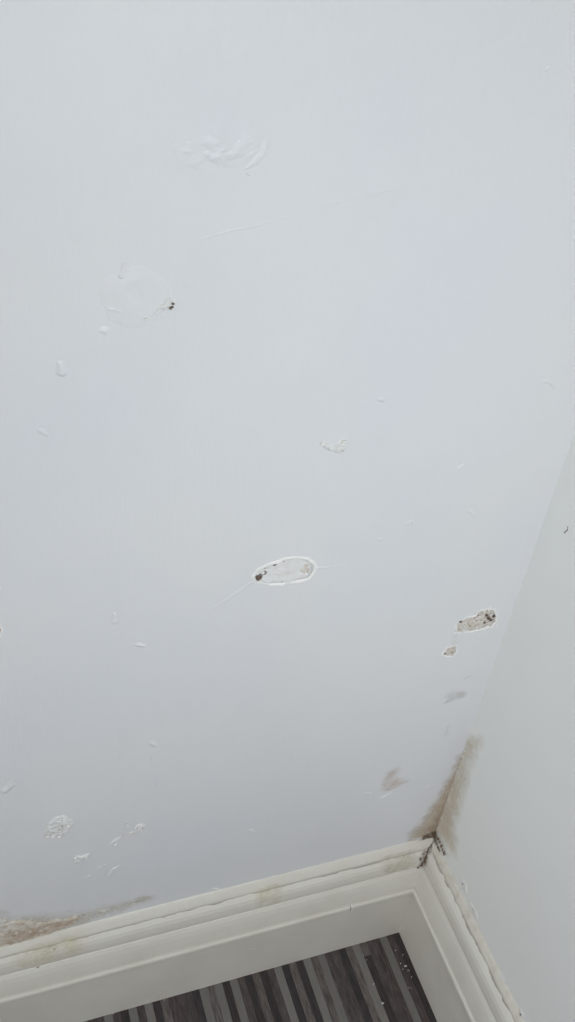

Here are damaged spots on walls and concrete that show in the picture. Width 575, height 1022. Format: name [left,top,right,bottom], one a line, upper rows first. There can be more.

spalling [251,556,318,587]
spalling [441,606,499,658]
damp [413,773,462,869]
spalling [0,916,79,946]